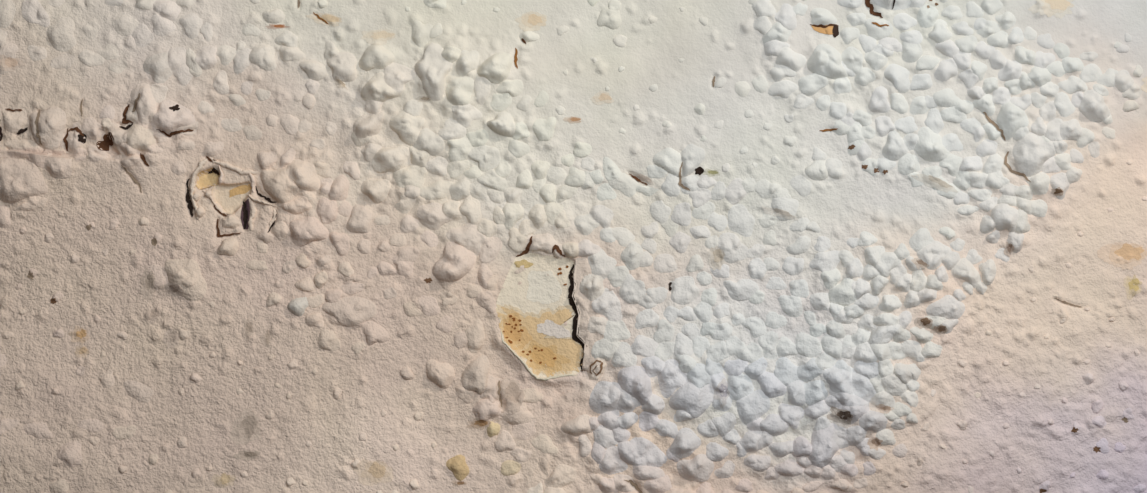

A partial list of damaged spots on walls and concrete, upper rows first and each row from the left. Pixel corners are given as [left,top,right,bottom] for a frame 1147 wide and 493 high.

peeling [241,199,250,229]
flaking render [496,253,607,381]